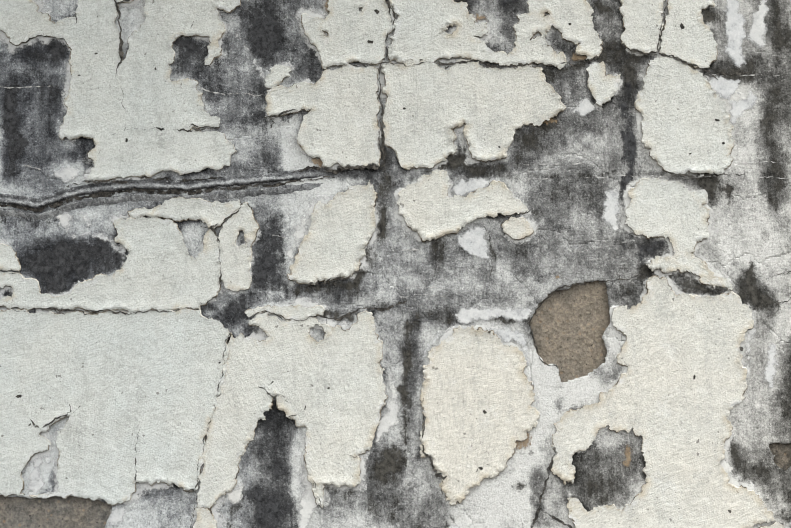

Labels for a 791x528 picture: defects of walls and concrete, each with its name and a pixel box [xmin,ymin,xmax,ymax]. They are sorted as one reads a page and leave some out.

damp [173,36,230,98]
crack [0,0,600,285]
damp [426,145,603,214]
damp [543,0,648,207]
crack [631,0,748,80]
peeling [0,286,98,315]
damp [17,236,127,295]
peeling [0,189,232,297]
peeling [148,0,610,528]
peeling [443,0,791,528]
damp [368,300,454,521]
spalling [0,417,204,528]